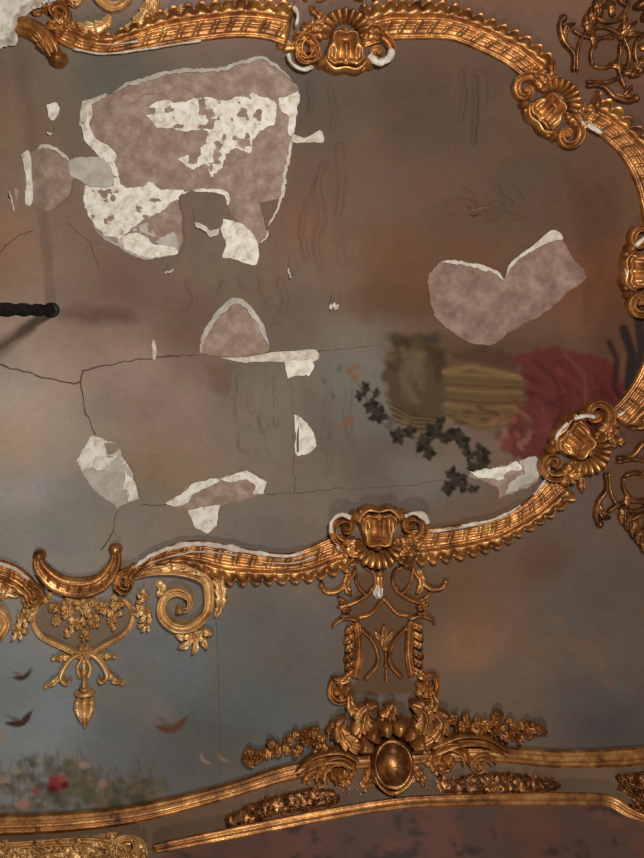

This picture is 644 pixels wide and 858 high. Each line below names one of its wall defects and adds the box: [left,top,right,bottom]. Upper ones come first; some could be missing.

flaking render [0,0,56,49]
flaking render [8,56,324,265]
flaking render [427,230,586,345]
crack [0,354,198,435]
peeling [285,359,314,378]
flaking render [77,436,139,508]
flaking render [166,470,267,533]
flaking render [294,414,316,456]
crack [265,378,465,495]
flaking render [469,456,539,499]